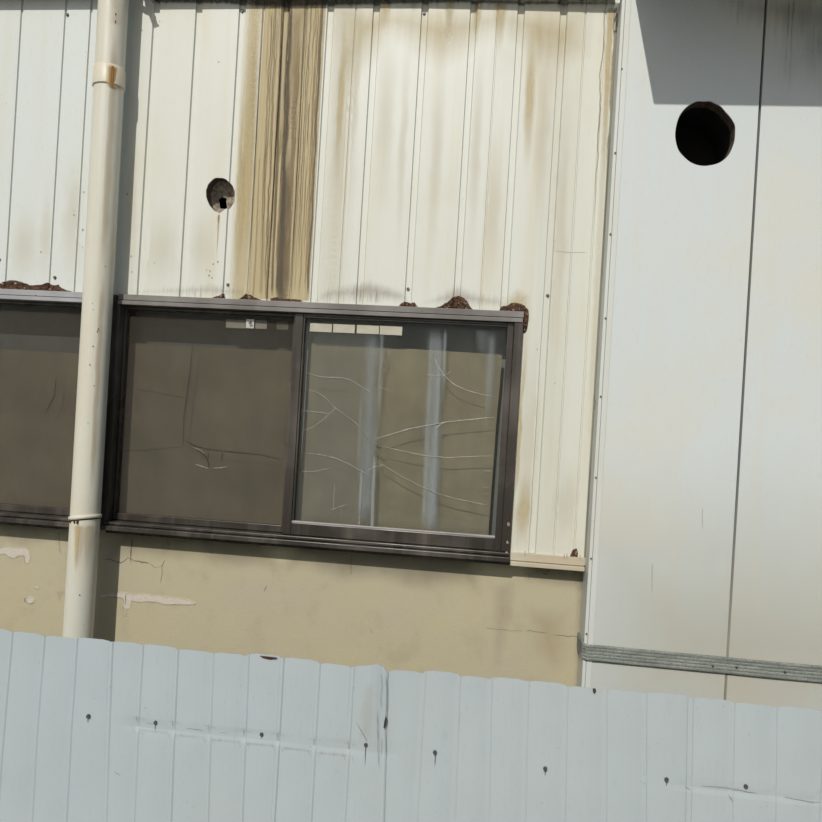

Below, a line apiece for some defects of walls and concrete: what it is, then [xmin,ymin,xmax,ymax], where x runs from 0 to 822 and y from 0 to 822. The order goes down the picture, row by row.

water stain [155,0,574,300]
rust [0,280,72,292]
rust [436,296,472,309]
rust [499,303,529,333]
peeling [0,546,31,565]
peeling [99,592,197,617]